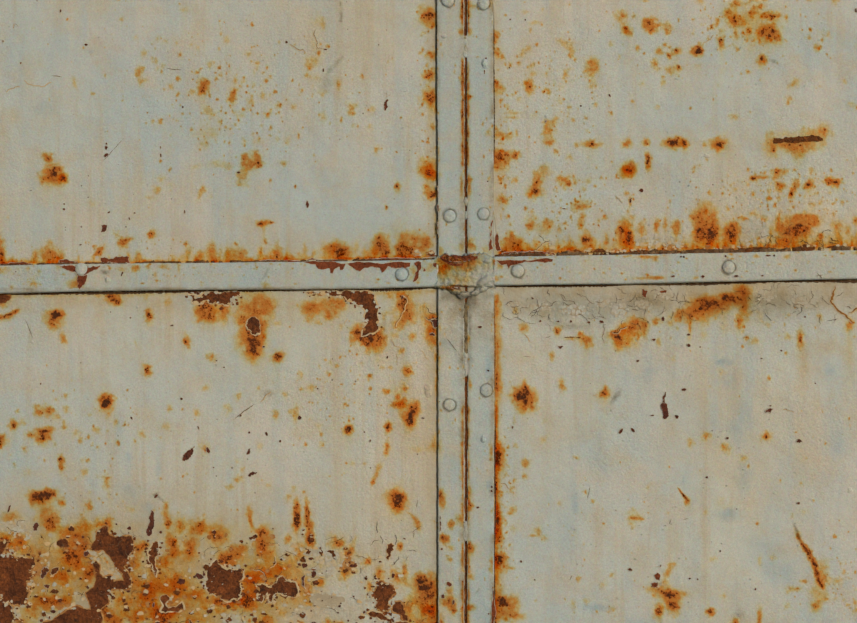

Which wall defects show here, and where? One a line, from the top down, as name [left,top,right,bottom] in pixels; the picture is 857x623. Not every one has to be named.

corrosion [357,237,415,259]
corrosion [697,216,736,244]
corrosion [246,325,263,356]
peeling [303,289,383,340]
corrosion [354,329,382,346]
crack [494,280,857,388]
corrosion [679,291,745,317]
corrosion [294,504,311,544]
peeling [0,505,414,623]
corrosion [416,576,442,623]